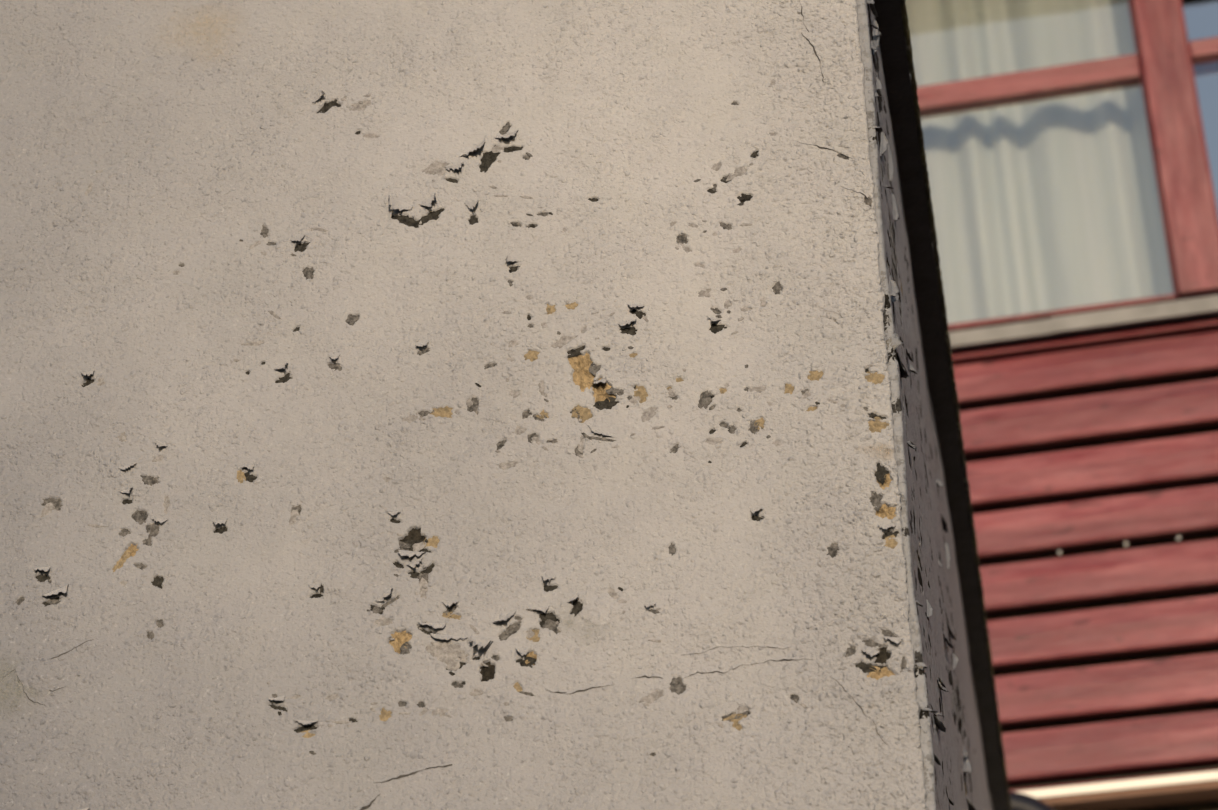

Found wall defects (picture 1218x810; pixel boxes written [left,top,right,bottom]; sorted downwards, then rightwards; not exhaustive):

crack [799,0,826,82]
peeling [388,193,445,228]
peeling [422,122,553,228]
peeling [698,288,767,335]
peeling [402,383,481,423]
flaking render [484,296,686,470]
peeling [698,383,729,410]
peeling [705,387,782,447]
peeling [845,0,976,810]
peeling [87,440,170,589]
peeling [367,511,583,697]
crack [358,762,452,810]